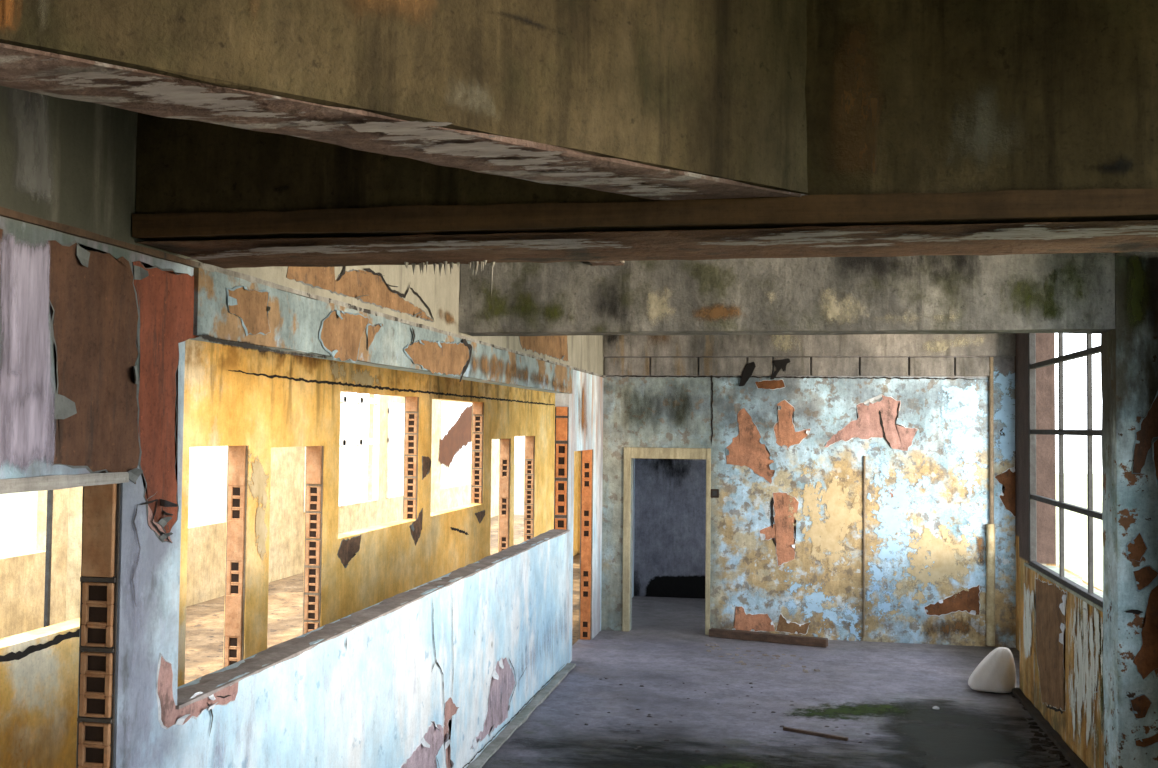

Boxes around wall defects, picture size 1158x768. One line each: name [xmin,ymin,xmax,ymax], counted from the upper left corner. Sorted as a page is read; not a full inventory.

peeling [37,58,702,199]
mould [843,255,977,277]
peeling [698,225,1158,248]
leakage [826,296,852,319]
flaking render [47,238,631,546]
crack [228,339,554,405]
flaking render [824,394,918,451]
flaking render [725,379,811,566]
flaking render [1126,532,1158,680]
spalling [0,585,107,763]
flaking render [400,697,459,768]
leakage [537,700,1043,768]